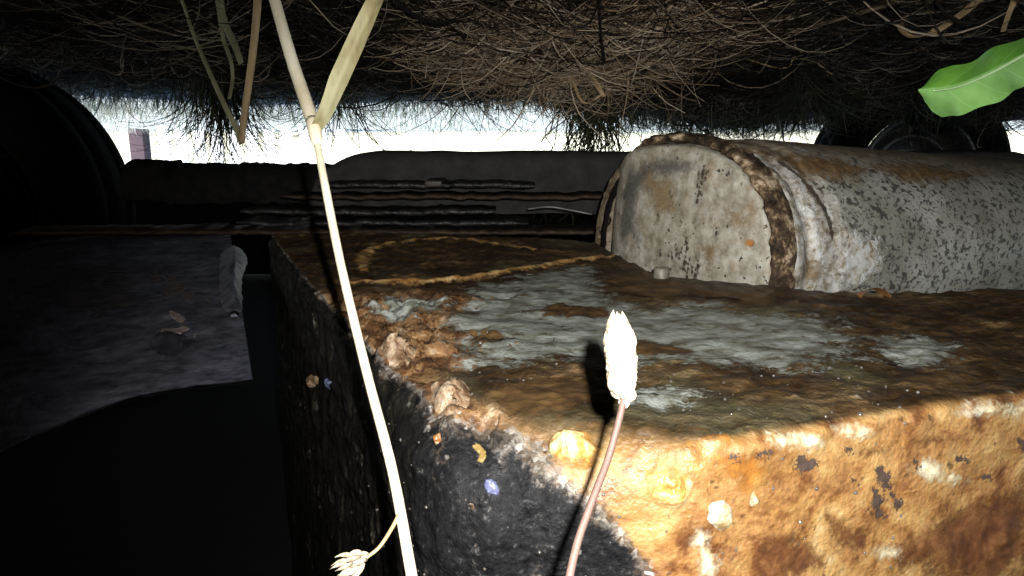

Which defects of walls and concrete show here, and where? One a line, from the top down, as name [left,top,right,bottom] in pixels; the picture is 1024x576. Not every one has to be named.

corrosion [479,377,706,446]
corrosion [714,418,764,493]
spalling [791,453,820,474]
spalling [849,464,904,520]
corrosion [753,534,824,576]
corrosion [826,514,865,551]
corrosion [898,491,1024,576]